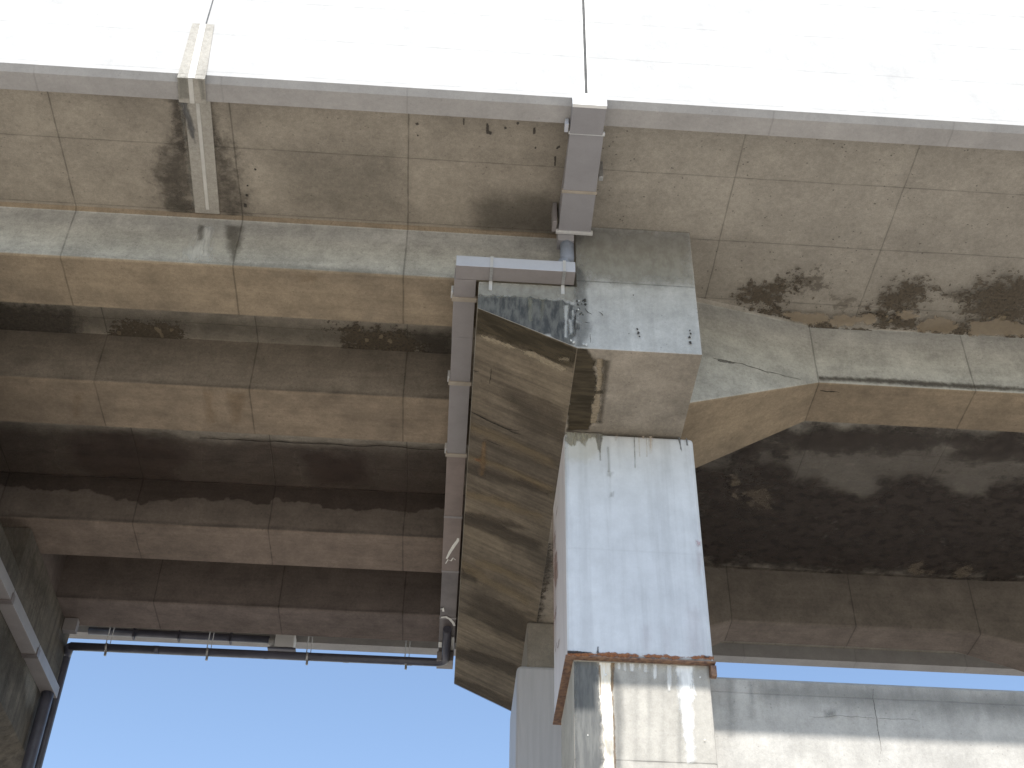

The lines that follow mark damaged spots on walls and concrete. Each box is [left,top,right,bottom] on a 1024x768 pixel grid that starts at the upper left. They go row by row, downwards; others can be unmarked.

water stain [157,100,194,209]
water stain [213,133,248,252]
peeling [107,318,189,339]
peeling [321,320,451,354]
water stain [476,283,604,451]
crack [714,358,798,379]
peeling [730,268,1024,338]
water stain [0,429,447,495]
water stain [464,513,539,550]
water stain [695,427,1024,582]
water stain [456,648,517,677]
water stain [676,666,706,762]